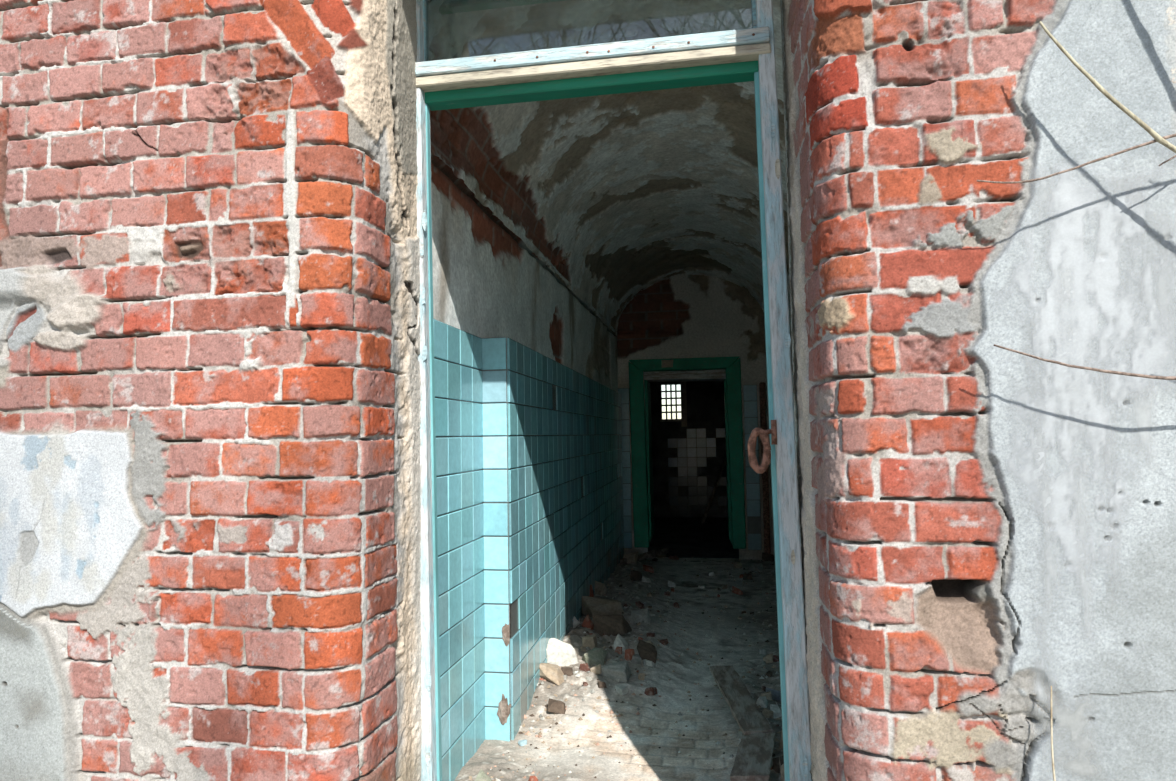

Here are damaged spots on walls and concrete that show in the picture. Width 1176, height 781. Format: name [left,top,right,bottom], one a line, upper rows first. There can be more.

spalling [812,5,866,57]
spalling [889,0,970,83]
spalling [201,42,306,138]
flaking render [592,83,758,170]
spalling [0,105,77,270]
flaking render [430,107,572,288]
spalling [158,224,290,297]
flaking render [586,277,691,389]
flaking render [689,275,766,360]
spalling [900,339,958,375]
flaking render [0,429,144,617]
spalling [914,579,1001,676]